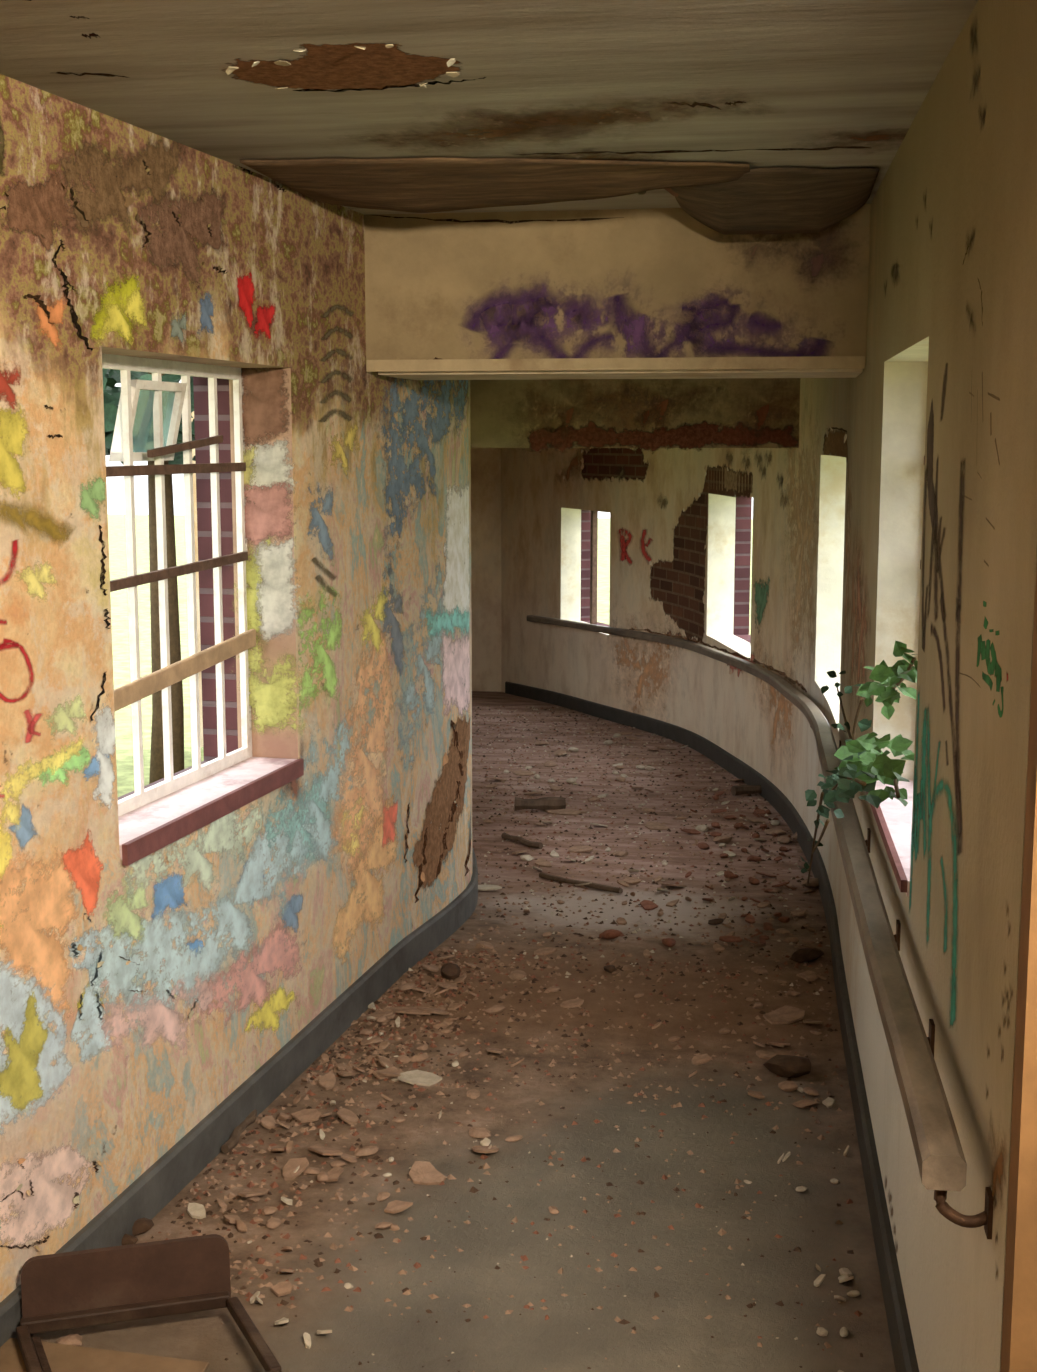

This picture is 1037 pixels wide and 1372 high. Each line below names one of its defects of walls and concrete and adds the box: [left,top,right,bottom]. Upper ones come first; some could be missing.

crack [69,16,101,39]
crack [56,71,128,79]
peeling [222,43,486,92]
peeling [0,121,228,284]
spalling [528,403,799,643]
spalling [727,653,756,677]
peeling [404,717,471,903]
peeling [79,952,140,1020]
peeling [0,1158,34,1202]
flaking render [187,1203,206,1219]
peeling [0,1236,50,1250]